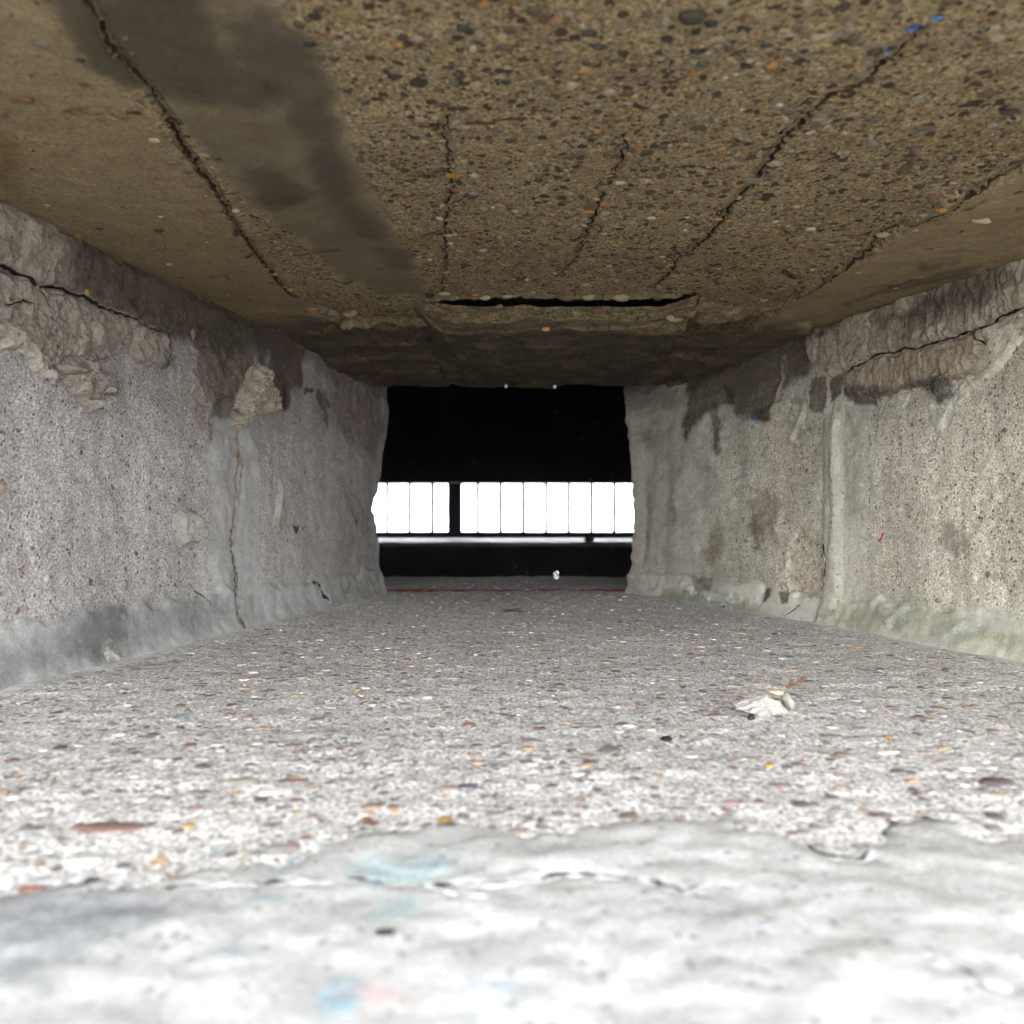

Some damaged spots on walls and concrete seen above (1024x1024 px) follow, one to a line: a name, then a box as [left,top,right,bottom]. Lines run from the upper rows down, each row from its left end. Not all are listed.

crack [0,263,164,334]
peeling [0,270,175,397]
crack [80,0,299,299]
crack [418,102,479,292]
crack [560,134,632,272]
spalling [208,0,1024,443]
crack [651,25,925,288]
leakage [682,323,959,454]
crack [760,160,1024,302]
crack [842,305,1024,376]